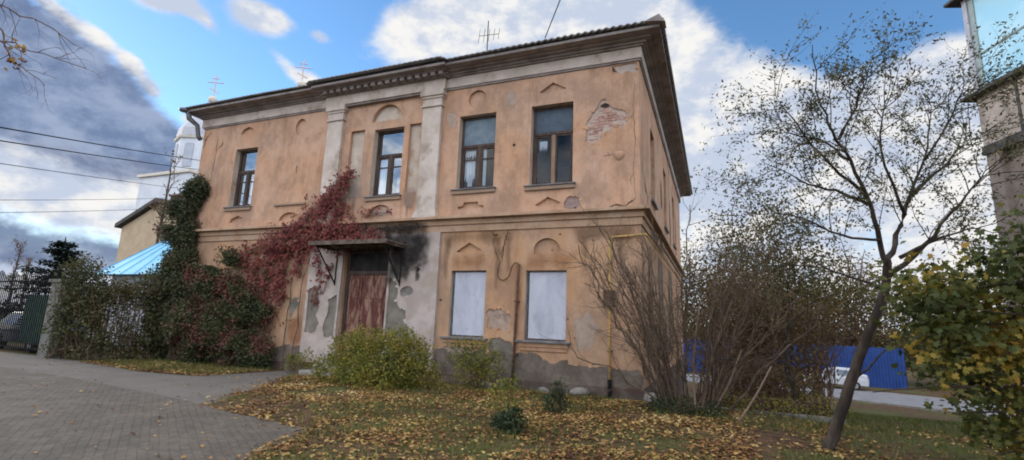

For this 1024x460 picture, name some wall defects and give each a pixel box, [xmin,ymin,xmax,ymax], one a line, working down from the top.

spalling [582,99,630,145]
spalling [289,285,337,338]
spalling [385,277,413,340]
peeling [434,305,643,389]